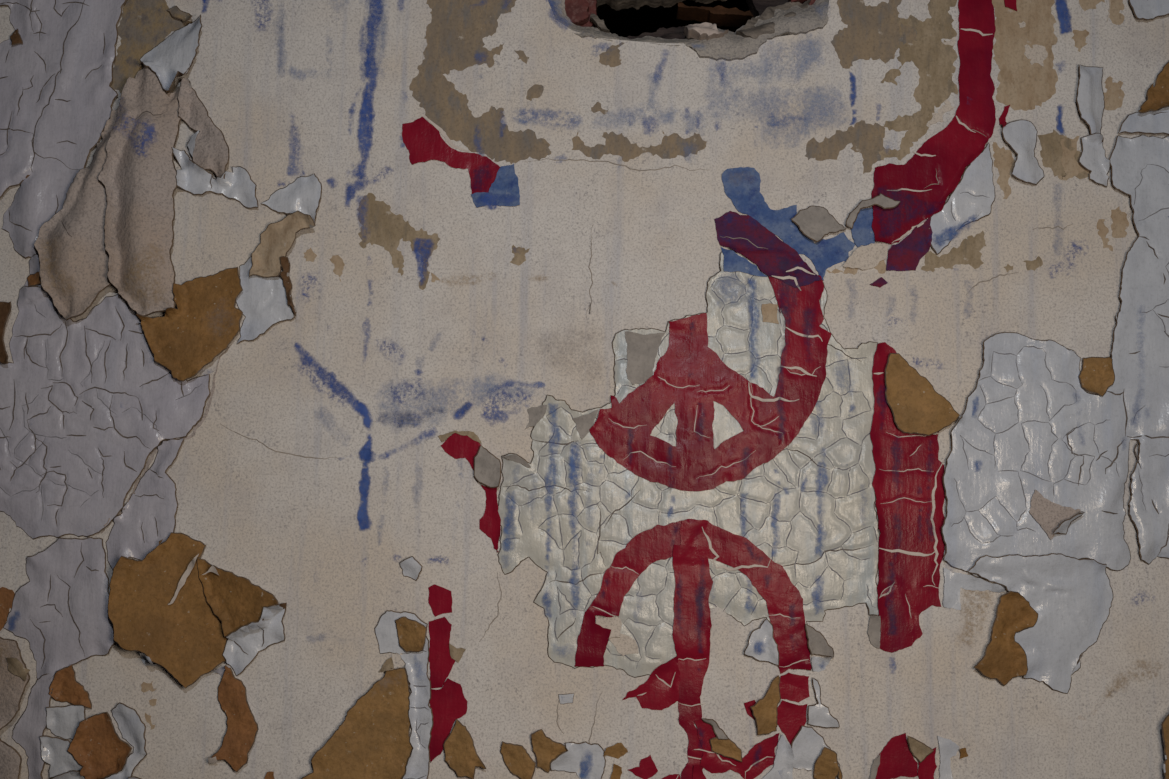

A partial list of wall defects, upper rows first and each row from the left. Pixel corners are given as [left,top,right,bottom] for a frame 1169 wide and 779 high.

peeling [0,0,345,779]
spalling [409,0,551,164]
peeling [497,0,1169,779]